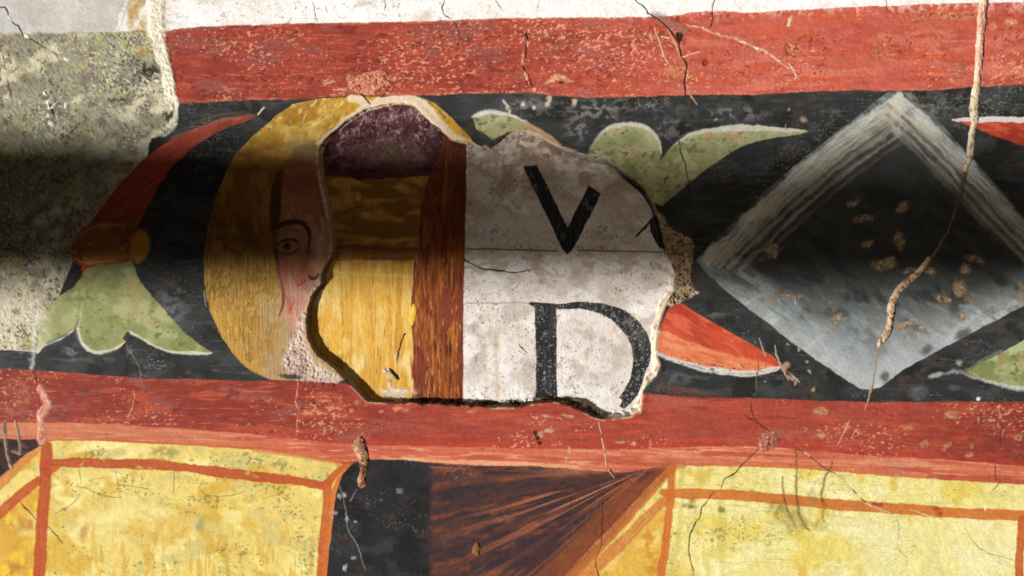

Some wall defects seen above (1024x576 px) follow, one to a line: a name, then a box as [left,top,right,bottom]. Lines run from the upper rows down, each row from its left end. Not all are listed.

crack [635,0,688,96]
flaking render [0,16,173,352]
spalling [306,102,698,445]
peeling [872,233,904,270]
peeling [937,255,983,303]
crack [867,347,879,404]
crack [688,360,771,571]
crack [795,446,866,502]